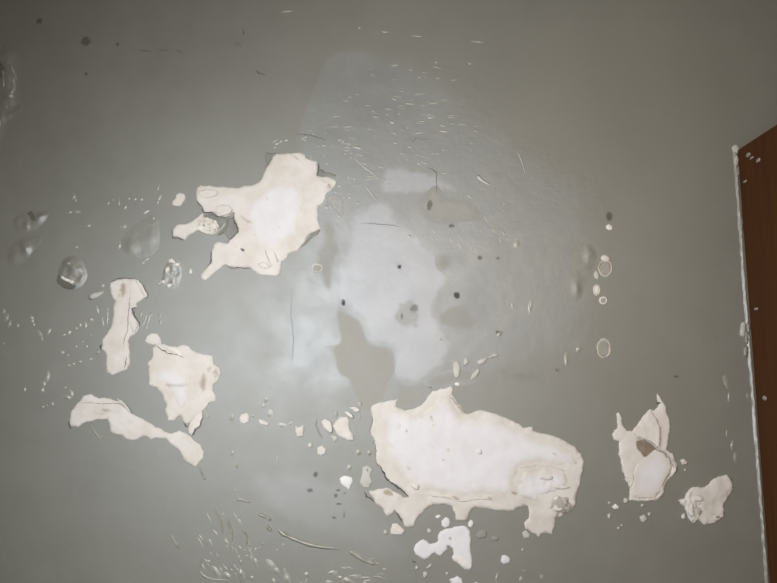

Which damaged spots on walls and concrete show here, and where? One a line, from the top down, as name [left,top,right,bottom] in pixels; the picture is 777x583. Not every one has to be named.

peeling [158,152,342,289]
leakage [255,44,611,419]
peeling [88,278,148,375]
peeling [68,333,221,467]
peeling [308,353,584,583]
peeling [608,394,688,522]
peeling [679,475,733,525]